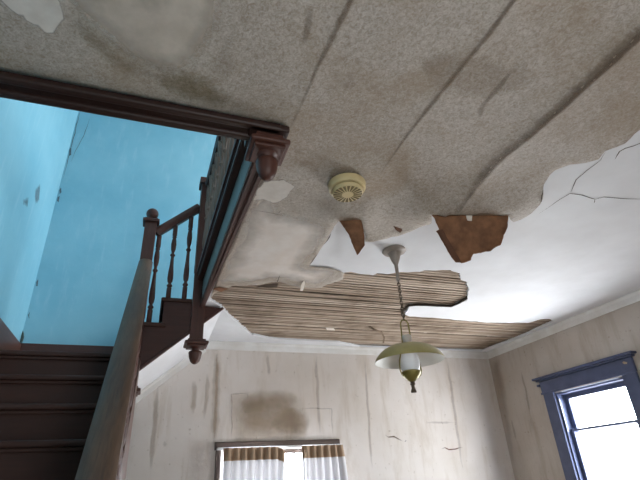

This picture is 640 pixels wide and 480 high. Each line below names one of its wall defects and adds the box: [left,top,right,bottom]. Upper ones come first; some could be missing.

flaking render [2,0,64,33]
crack [540,143,640,213]
spalling [210,180,551,349]